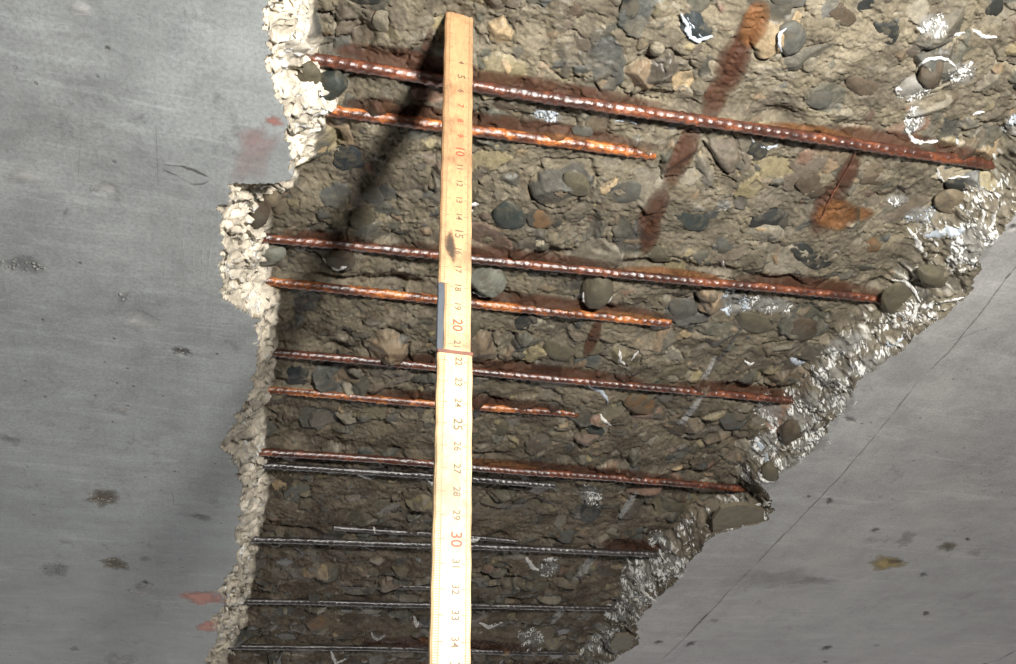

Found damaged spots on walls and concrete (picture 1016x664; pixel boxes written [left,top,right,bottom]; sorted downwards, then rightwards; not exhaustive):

rust [340,37,444,74]
rust [705,4,768,115]
rust [351,84,442,120]
rust [473,69,648,106]
rust [472,113,631,148]
rust [773,123,970,159]
rust [471,246,607,268]
rust [471,292,661,355]
spalling [204,0,1016,664]
crack [934,268,1015,366]
rust [472,360,628,382]
crack [762,397,906,558]